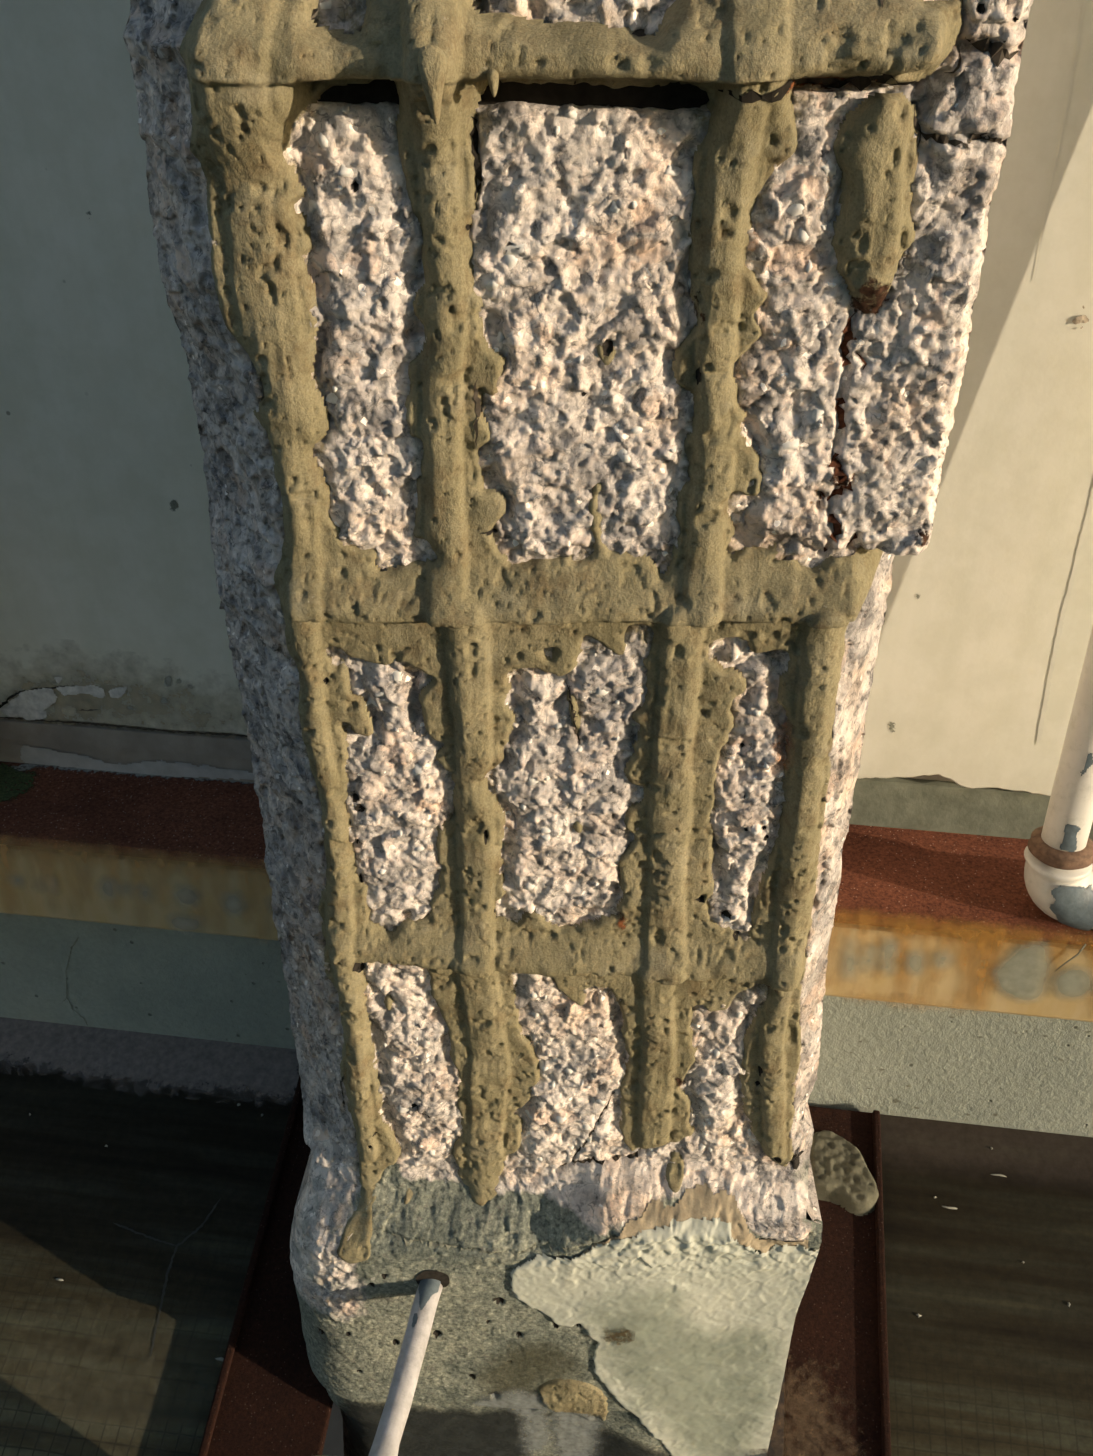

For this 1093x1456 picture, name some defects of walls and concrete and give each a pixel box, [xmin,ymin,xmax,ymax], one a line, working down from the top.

spalling [472,0,675,37]
spalling [466,73,917,574]
crack [816,313,867,552]
corrosion [850,277,891,315]
spalling [1,0,463,1162]
peeling [484,551,895,1456]
crack [560,1092,641,1166]